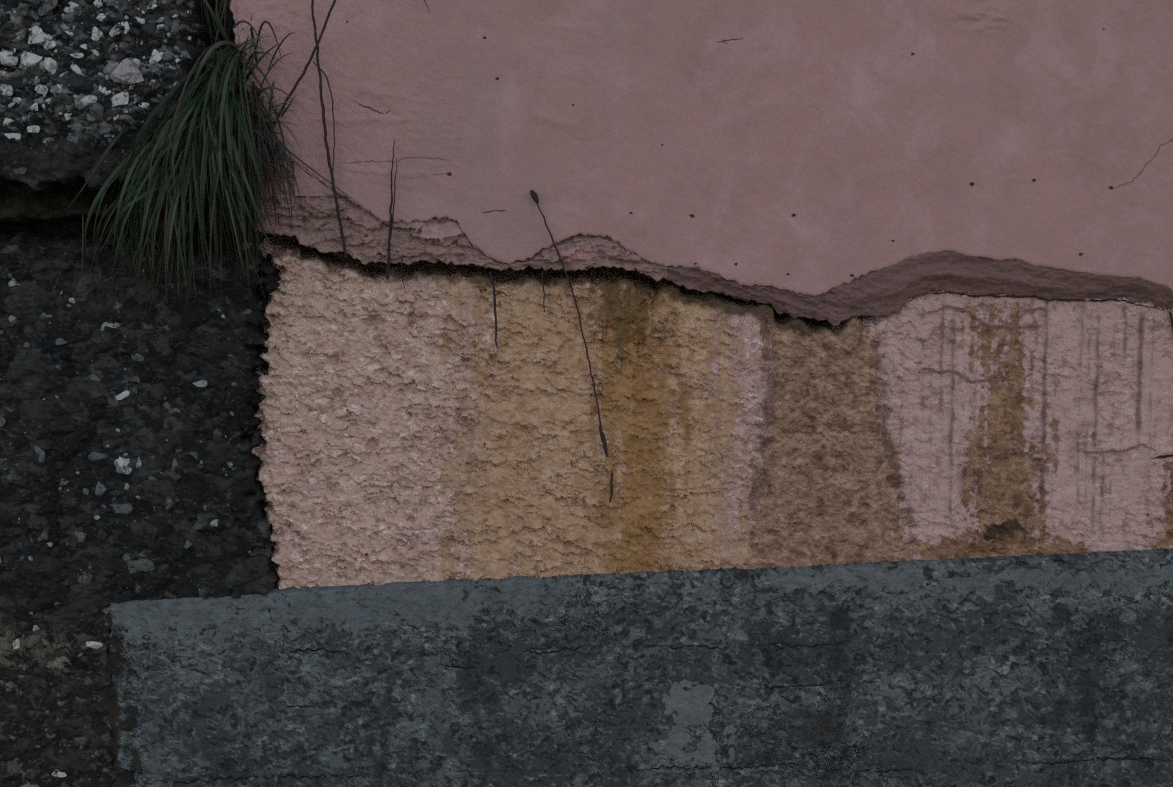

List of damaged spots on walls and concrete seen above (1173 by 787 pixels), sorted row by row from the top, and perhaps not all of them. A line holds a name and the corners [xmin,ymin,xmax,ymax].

crack [1113,139,1173,189]
peeling [253,143,1173,570]
damp [939,319,955,465]
damp [1136,316,1151,430]